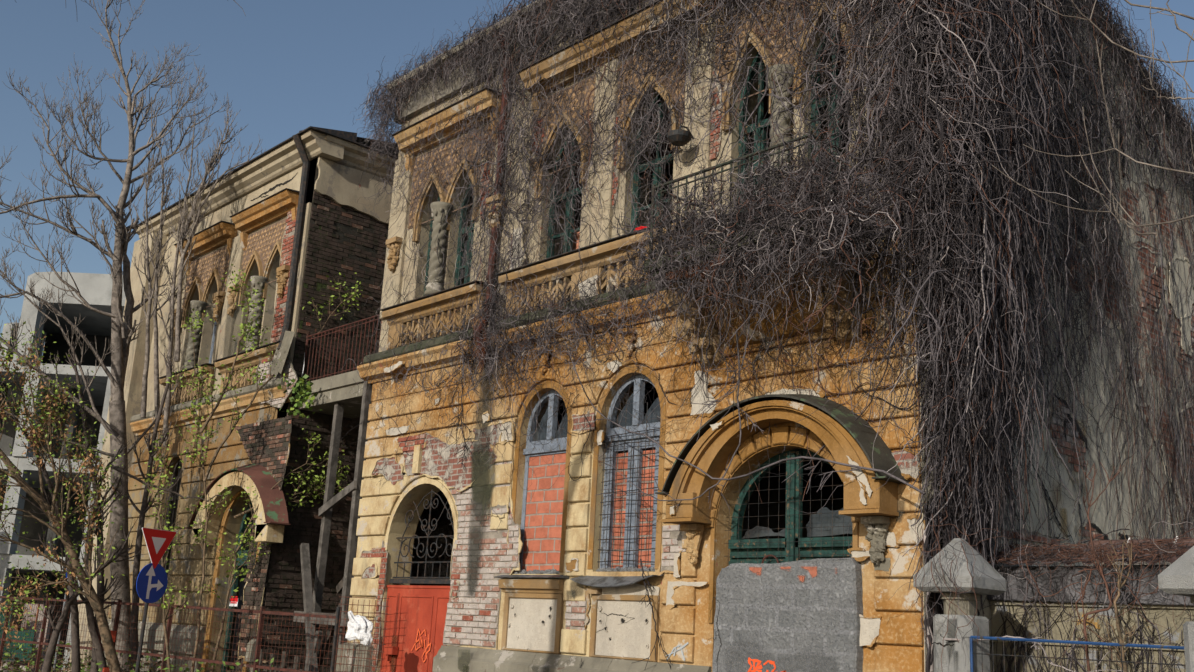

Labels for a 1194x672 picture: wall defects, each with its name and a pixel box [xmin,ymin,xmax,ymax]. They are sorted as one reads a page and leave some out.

spalling [1049,121,1194,513]
spalling [688,370,724,431]
spalling [370,411,523,650]
spalling [847,456,872,505]
spalling [359,541,388,672]